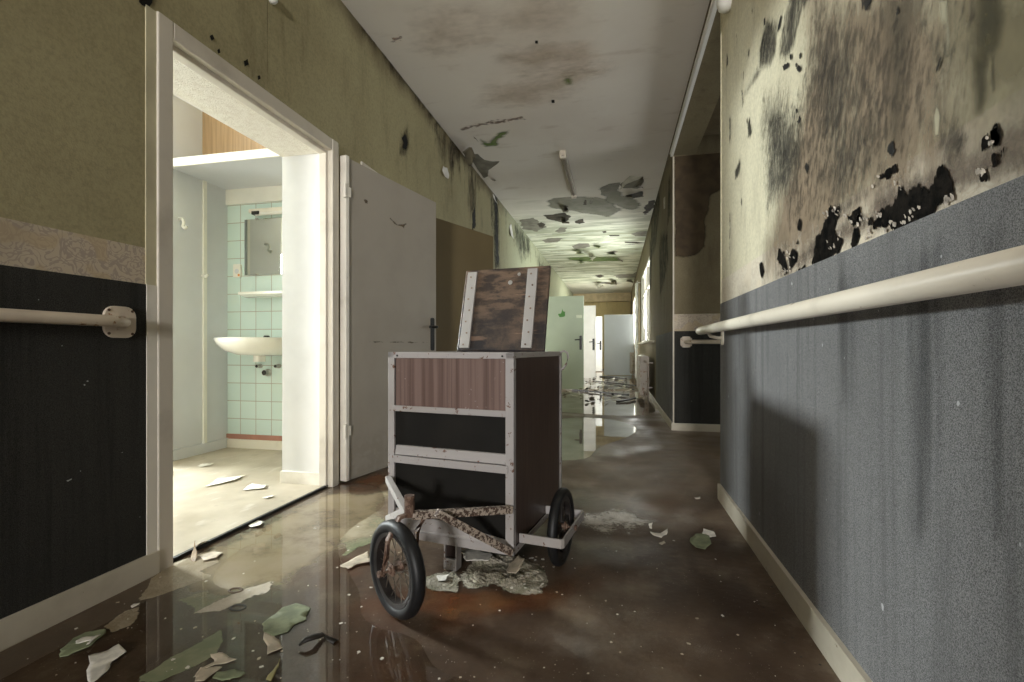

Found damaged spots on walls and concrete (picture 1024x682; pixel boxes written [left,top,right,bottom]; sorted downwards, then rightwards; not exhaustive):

peeling [463,137,500,181]
water stain [743,0,1024,273]
spalling [975,123,1004,182]
water stain [468,178,476,230]
water stain [491,195,500,268]
water stain [515,226,543,266]
peeling [509,176,665,243]
peeling [567,231,647,287]
water stain [650,153,720,293]
spalling [776,164,954,276]